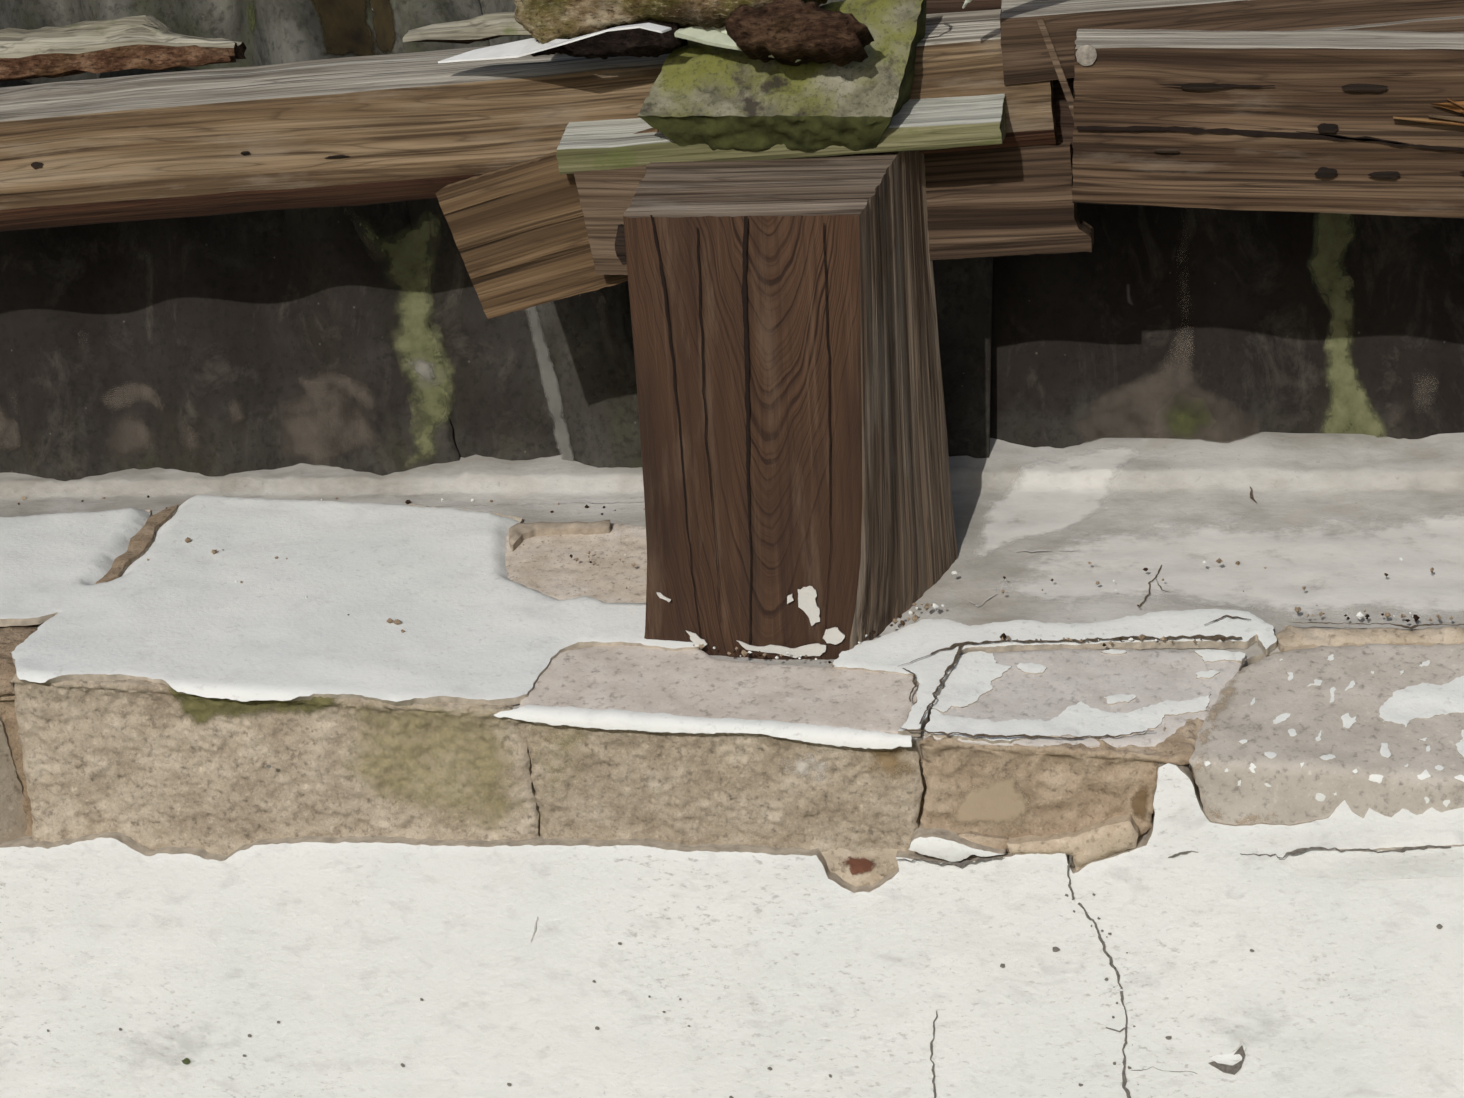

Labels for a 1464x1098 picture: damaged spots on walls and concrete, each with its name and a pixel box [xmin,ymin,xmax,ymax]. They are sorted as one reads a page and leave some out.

leakage [415,360,434,381]
leakage [0,410,19,448]
leakage [105,383,161,455]
leakage [284,373,374,462]
peeling [505,519,671,603]
spalling [0,586,1464,887]
crack [897,856,1004,868]
crack [1065,855,1197,1098]
crack [930,1011,938,1098]